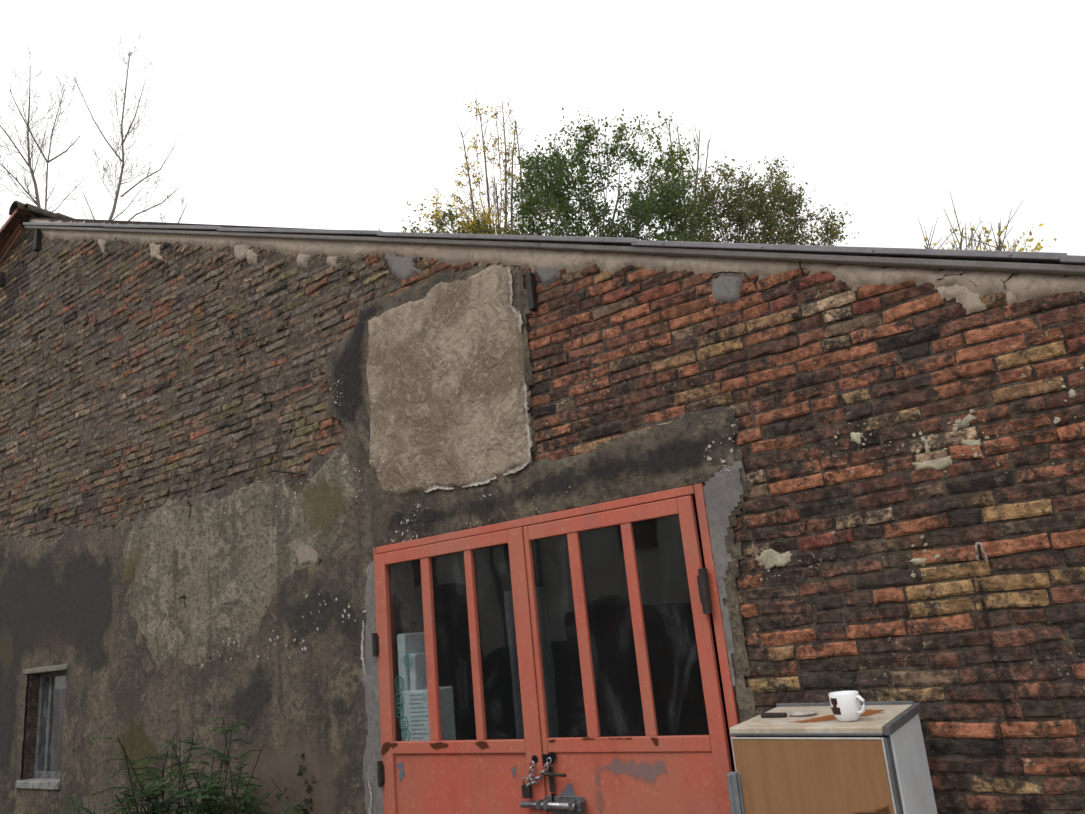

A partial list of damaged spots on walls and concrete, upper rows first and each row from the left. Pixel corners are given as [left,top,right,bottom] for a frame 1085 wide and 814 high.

spalling [150,242,167,263]
spalling [234,244,258,265]
spalling [296,254,311,268]
flaking render [385,254,421,280]
flaking render [507,266,523,333]
flaking render [710,274,743,304]
flaking render [937,284,987,315]
flaking render [1006,291,1018,305]
flaking render [391,371,532,542]
water stain [389,438,709,530]
water stain [0,546,112,767]
peeling [596,759,665,809]